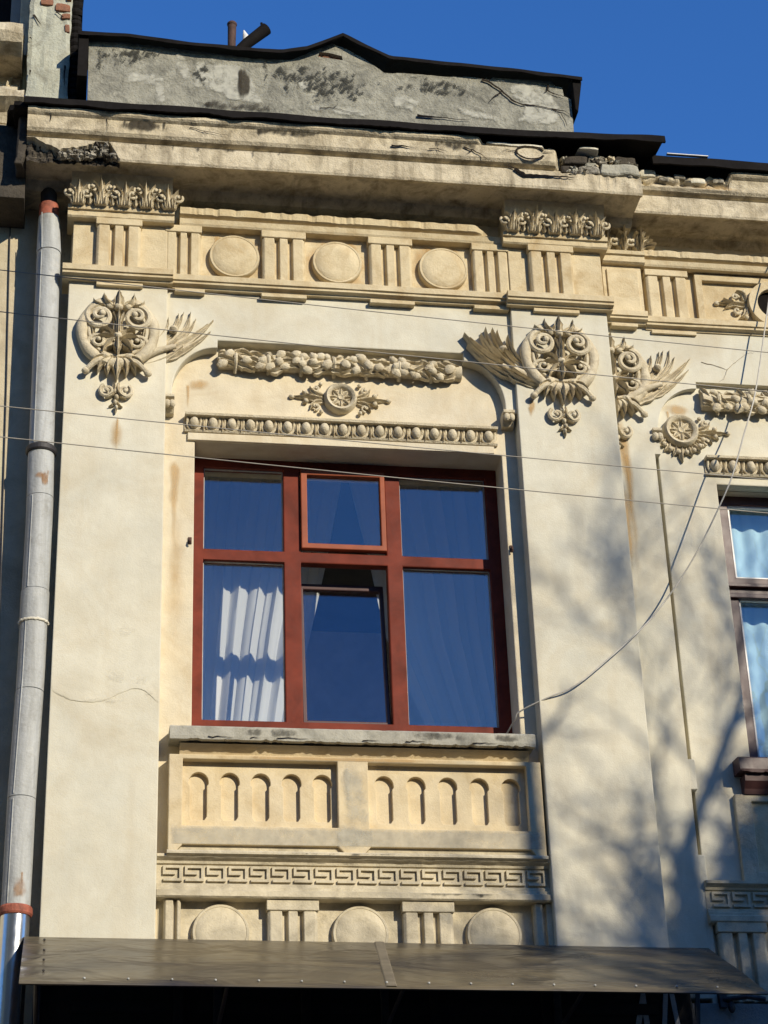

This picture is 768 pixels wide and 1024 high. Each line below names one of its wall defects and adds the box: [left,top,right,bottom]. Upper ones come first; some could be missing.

damp [205,69,271,110]
crack [482,78,569,125]
spalling [27,141,120,169]
spalling [507,147,725,188]
corrosion [621,441,632,550]